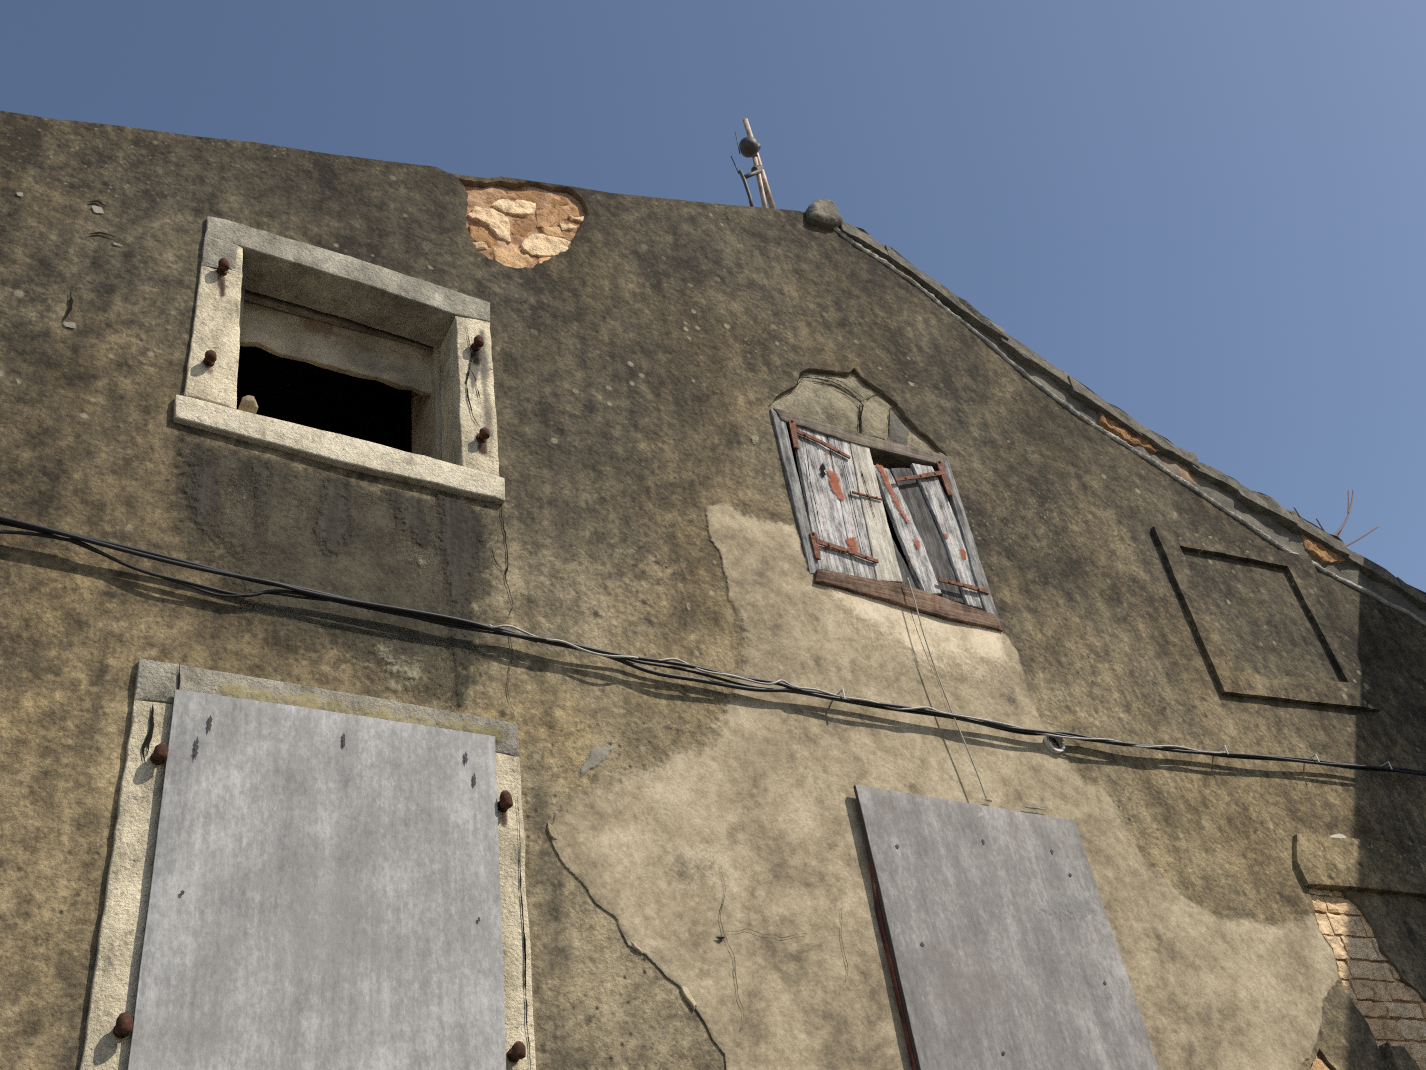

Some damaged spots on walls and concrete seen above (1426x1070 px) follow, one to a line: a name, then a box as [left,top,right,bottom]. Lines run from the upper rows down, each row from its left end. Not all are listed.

spalling [464,186,586,268]
water stain [173,436,499,707]
crack [716,866,806,1031]
spalling [1309,888,1426,1070]